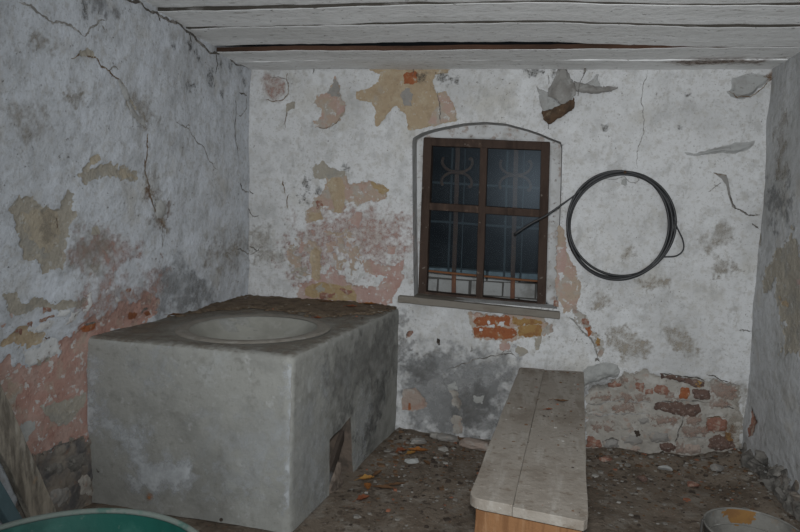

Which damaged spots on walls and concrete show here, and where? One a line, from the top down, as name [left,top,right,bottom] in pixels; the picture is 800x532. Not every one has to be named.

crack [127,0,246,74]
crack [19,2,169,247]
crack [177,122,216,169]
crack [235,93,247,157]
peeling [356,69,457,130]
crack [636,70,648,169]
peeling [284,160,405,305]
peeling [0,189,167,512]
leakage [400,351,514,440]
spalling [467,311,553,357]
peeling [554,225,648,361]
spalling [584,368,800,522]